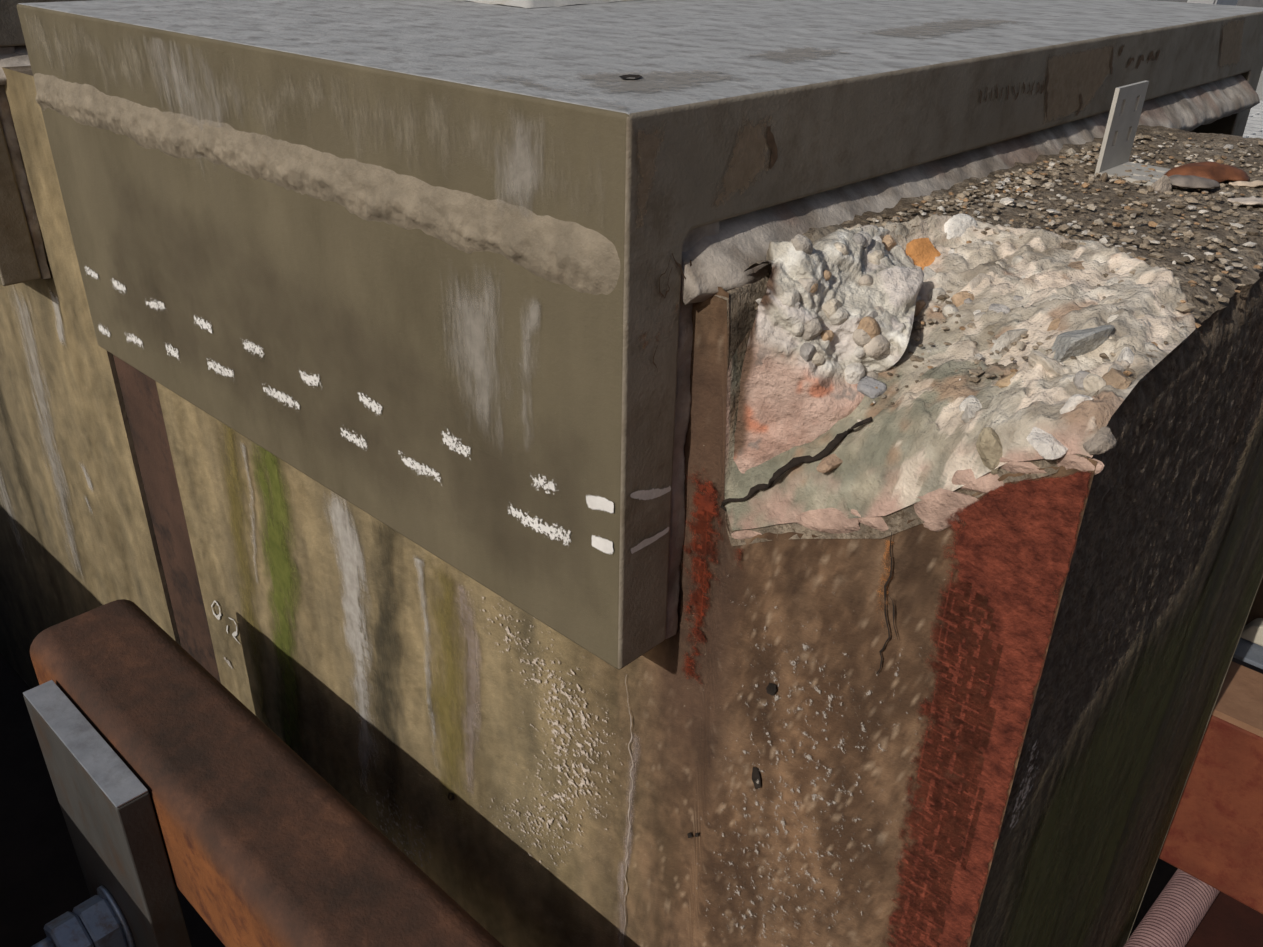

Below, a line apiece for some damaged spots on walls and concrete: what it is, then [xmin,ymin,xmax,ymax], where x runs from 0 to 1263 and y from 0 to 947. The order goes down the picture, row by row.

leakage [226,427,301,750]
leakage [331,500,400,811]
leakage [415,559,478,805]
crack [720,417,872,511]
spalling [725,214,1196,540]
rust [887,471,1092,947]